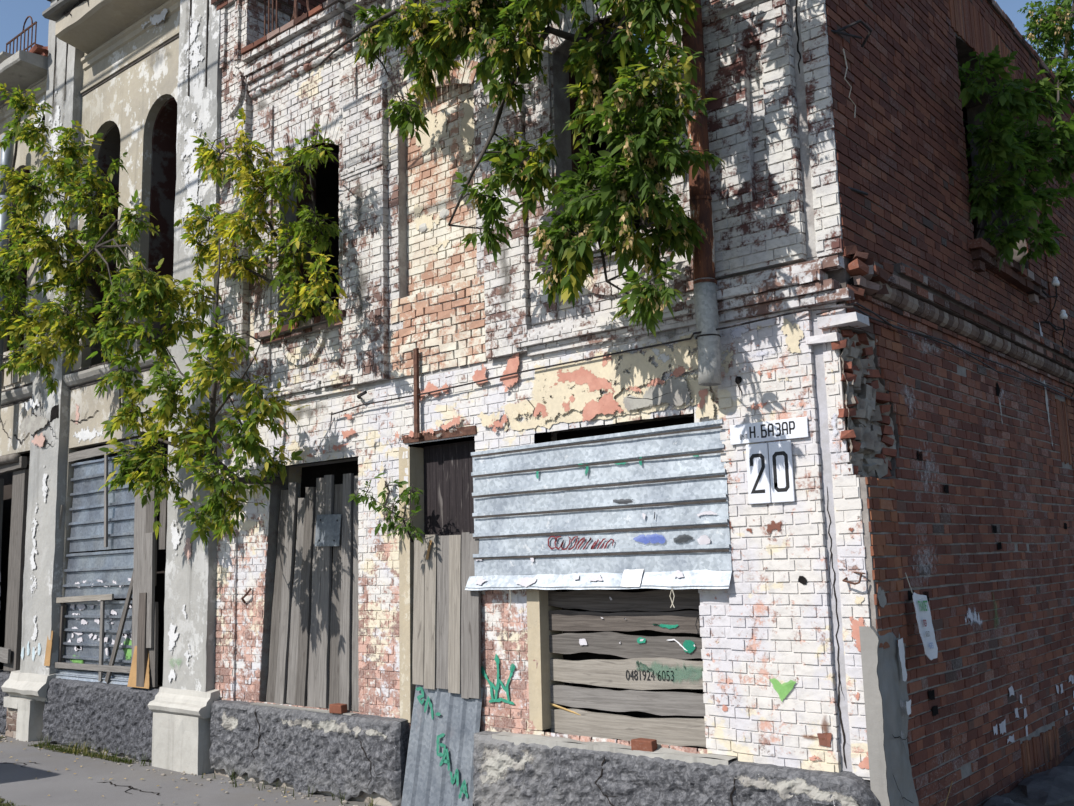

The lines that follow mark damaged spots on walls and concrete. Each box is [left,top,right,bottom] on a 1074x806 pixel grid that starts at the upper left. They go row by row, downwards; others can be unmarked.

crack [794,0,802,74]
crack [0,392,98,447]
spalling [831,330,897,478]
peeling [29,465,48,654]
crack [827,489,849,768]